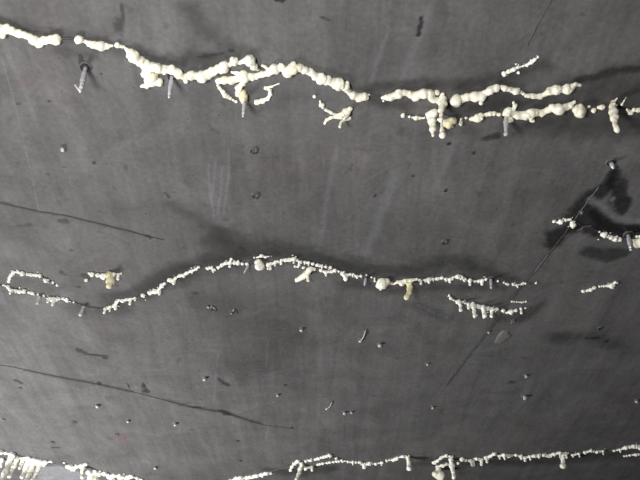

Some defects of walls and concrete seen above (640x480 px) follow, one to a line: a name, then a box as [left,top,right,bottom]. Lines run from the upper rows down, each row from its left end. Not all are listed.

damp [547,169,640,248]
crack [200,255,396,283]
crack [0,271,174,309]
crack [269,456,350,472]
crack [372,454,501,463]